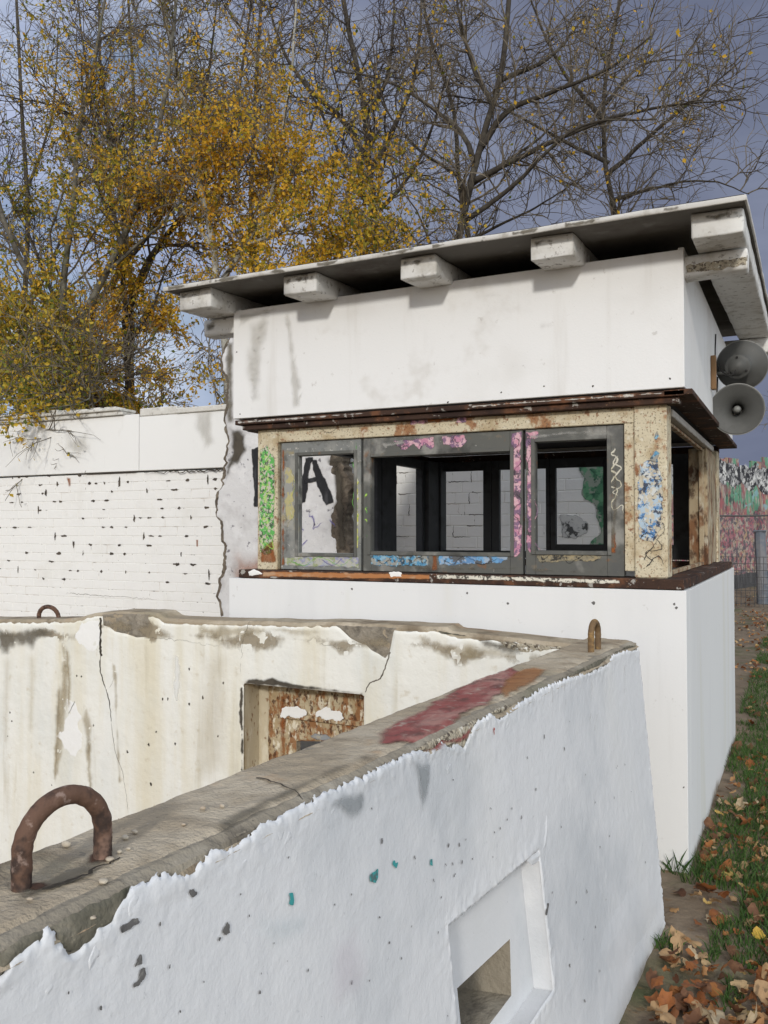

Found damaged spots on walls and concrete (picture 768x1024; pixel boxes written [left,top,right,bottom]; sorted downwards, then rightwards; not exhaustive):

leakage [0,629,47,651]
spalling [103,613,151,637]
spalling [336,625,396,658]
crack [365,652,391,692]
spalling [500,641,563,652]
spalling [559,645,636,680]
leakage [57,657,69,726]
crack [74,593,149,809]
peeling [259,685,268,765]
peeling [280,706,344,722]
spalling [0,886,140,967]
peeling [133,954,146,987]